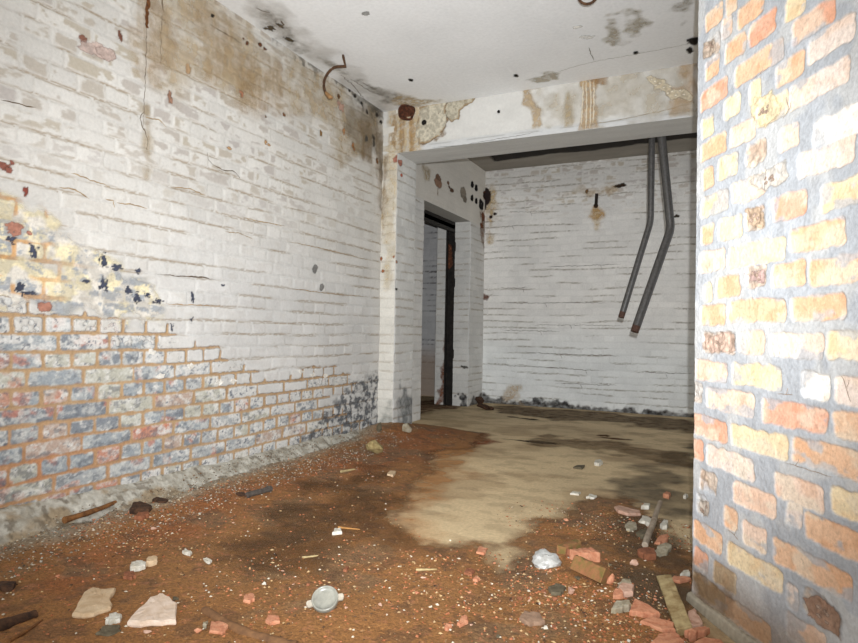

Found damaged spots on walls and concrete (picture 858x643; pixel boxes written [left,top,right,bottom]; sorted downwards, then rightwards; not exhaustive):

spalling [78,35,116,61]
crack [140,0,163,149]
water stain [288,69,423,155]
spalling [398,98,475,145]
water stain [523,73,609,130]
peeling [0,187,379,508]